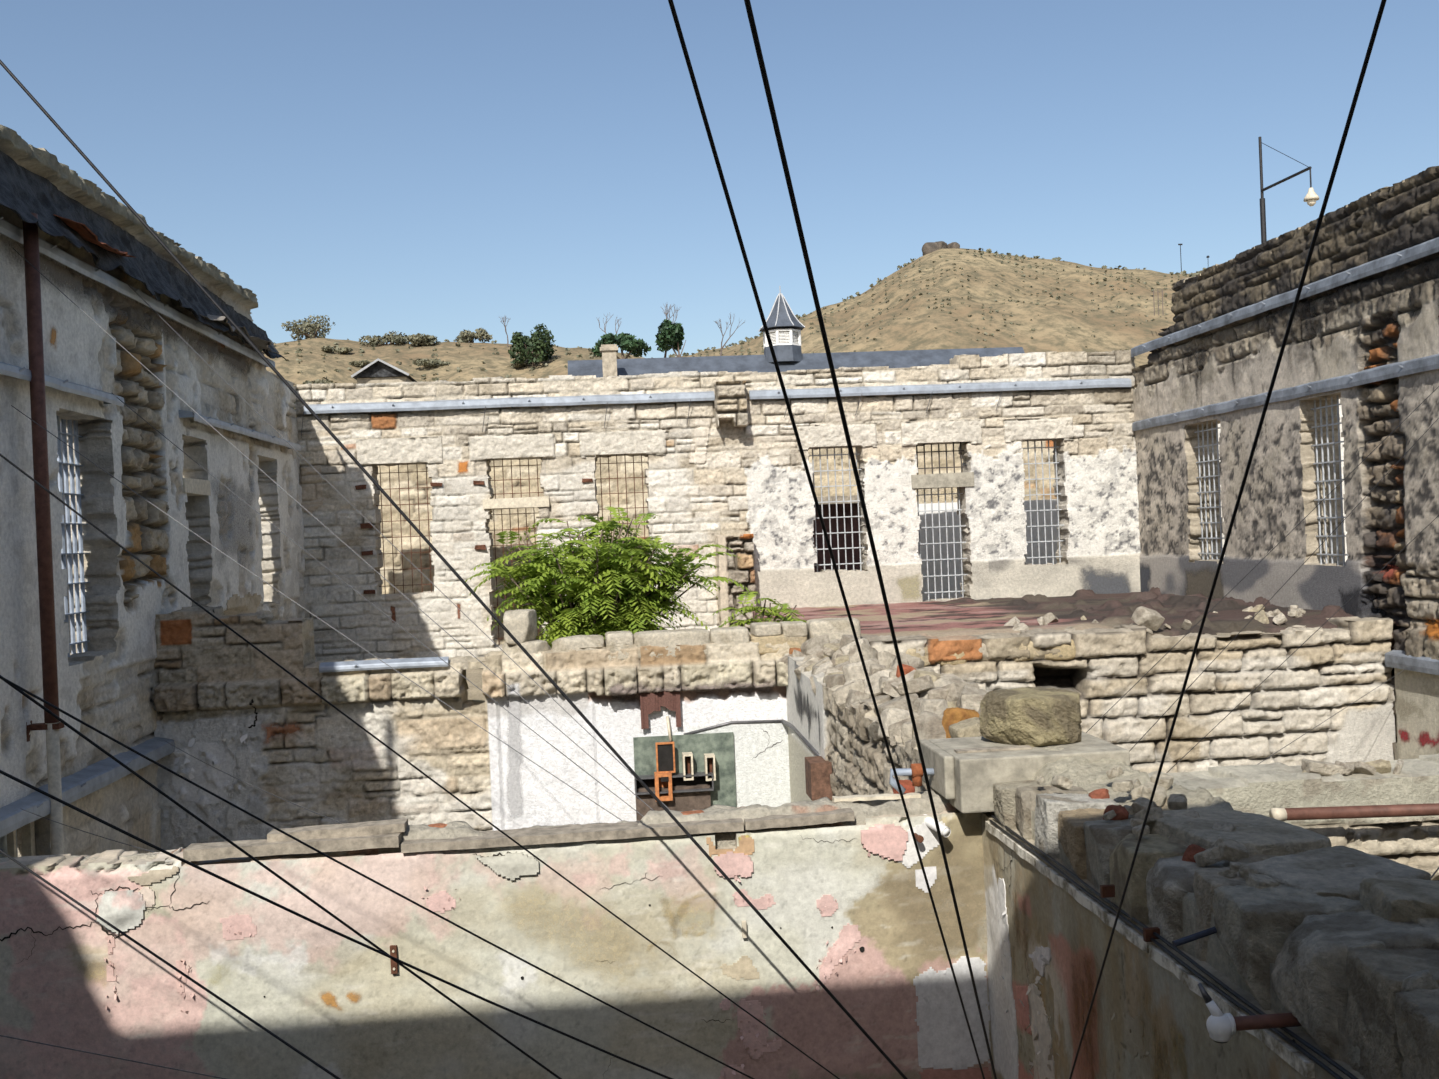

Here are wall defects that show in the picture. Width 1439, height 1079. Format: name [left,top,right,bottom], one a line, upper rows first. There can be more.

crack [0,869,206,962]
peeling [104,936,117,1010]
spalling [128,866,179,907]
peeling [176,960,194,1014]
corrosion [321,993,359,1007]
peeling [421,886,460,919]
peeling [706,835,776,910]
peeling [718,956,783,1079]
peeling [816,895,865,991]
peeling [860,819,945,893]
peeling [913,878,1059,1079]